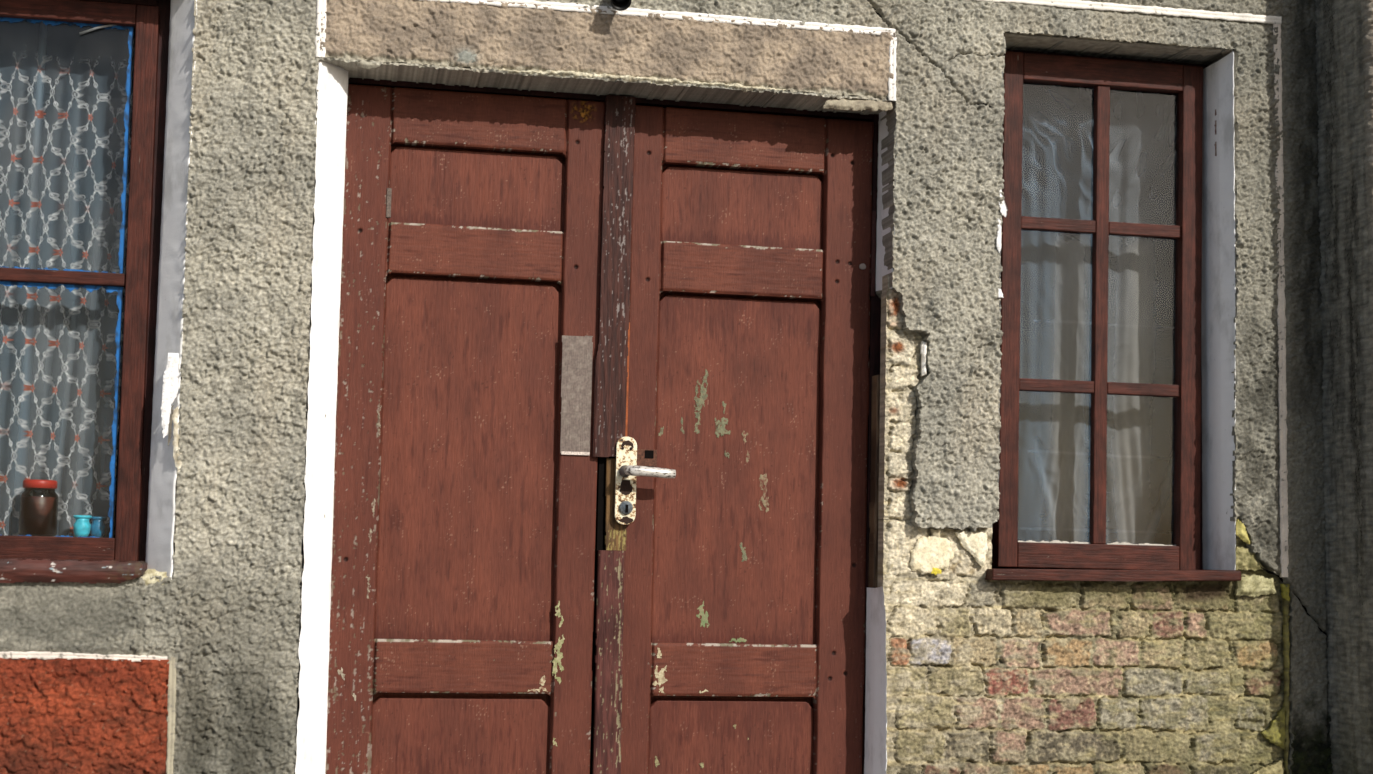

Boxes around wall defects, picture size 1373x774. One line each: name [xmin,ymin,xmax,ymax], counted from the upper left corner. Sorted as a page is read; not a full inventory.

crack [867,0,999,107]
peeling [996,190,1008,253]
spalling [877,274,1285,774]
crack [1260,566,1327,636]